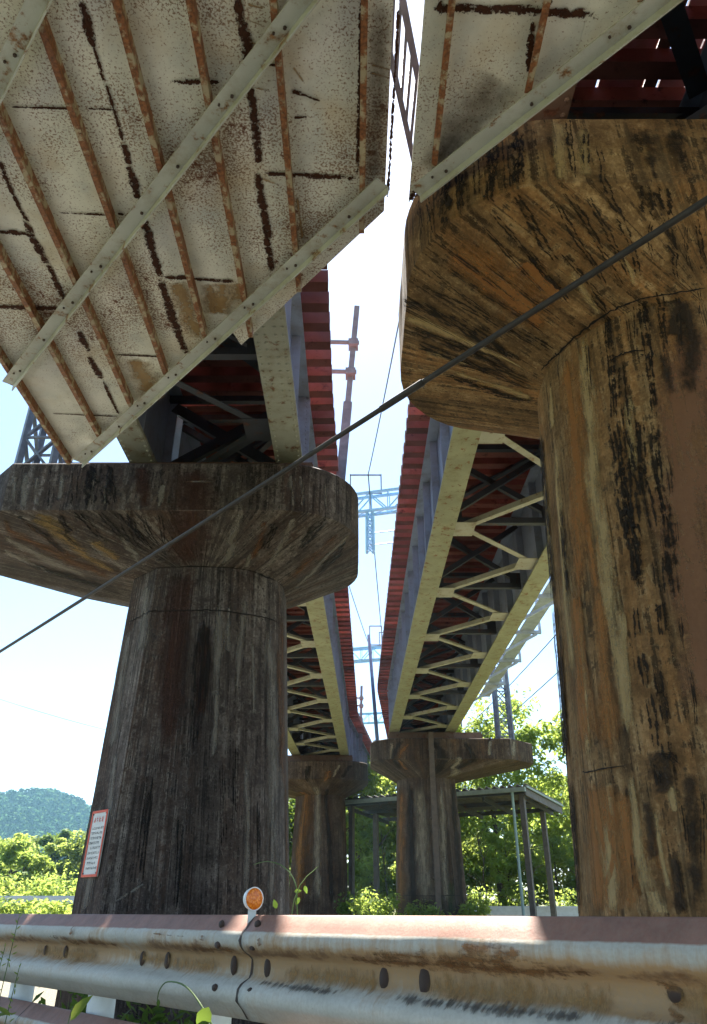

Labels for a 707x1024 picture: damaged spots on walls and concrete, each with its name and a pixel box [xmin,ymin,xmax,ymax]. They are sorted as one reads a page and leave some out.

rust [78,2,141,199]
rust [233,0,263,60]
rust [247,2,400,272]
rust [434,0,595,72]
rust [0,162,65,311]
rust [141,221,241,354]
crack [541,288,704,373]
water stain [5,465,166,595]
water stain [244,475,327,568]
water stain [403,120,706,913]
water stain [95,586,151,826]
water stain [190,600,279,899]